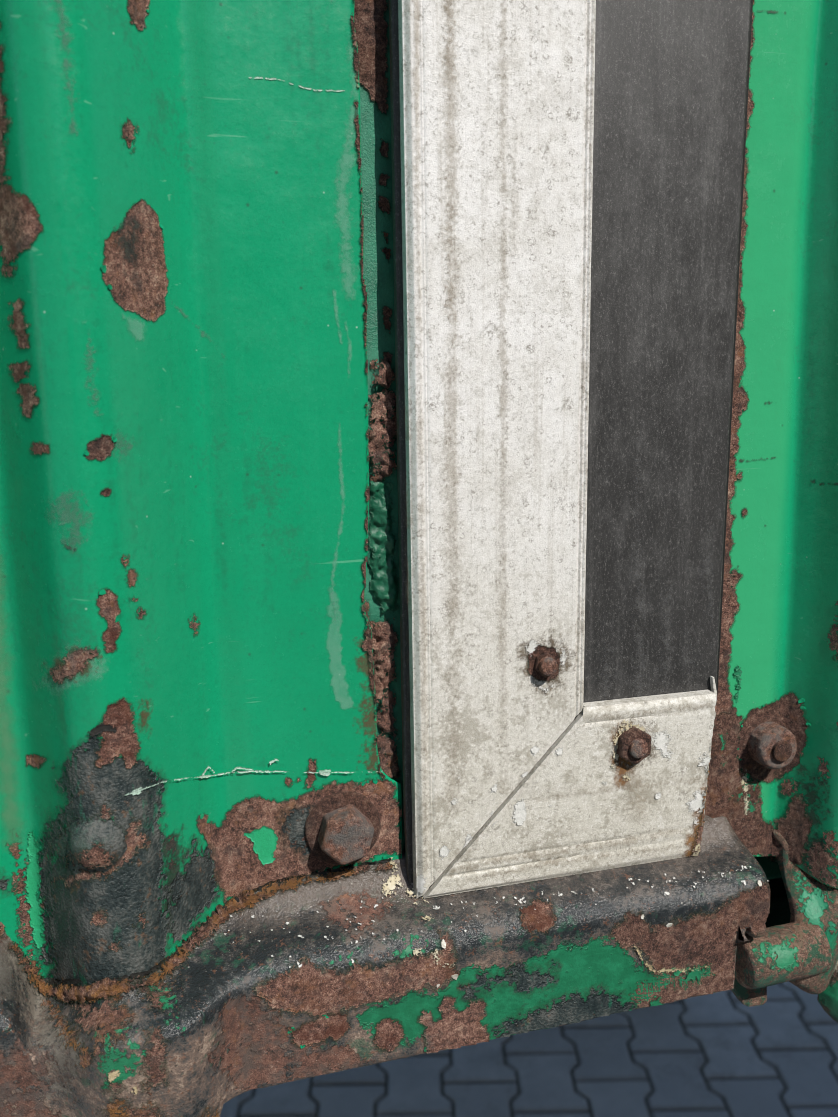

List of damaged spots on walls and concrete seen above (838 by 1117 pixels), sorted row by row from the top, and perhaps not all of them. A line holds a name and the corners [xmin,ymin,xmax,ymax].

rust [685,0,838,891]
rust [0,0,402,1117]
rust [517,635,576,697]
rust [612,719,656,787]
rust [519,899,557,933]
rust [610,880,770,1008]
rust [207,930,490,1091]